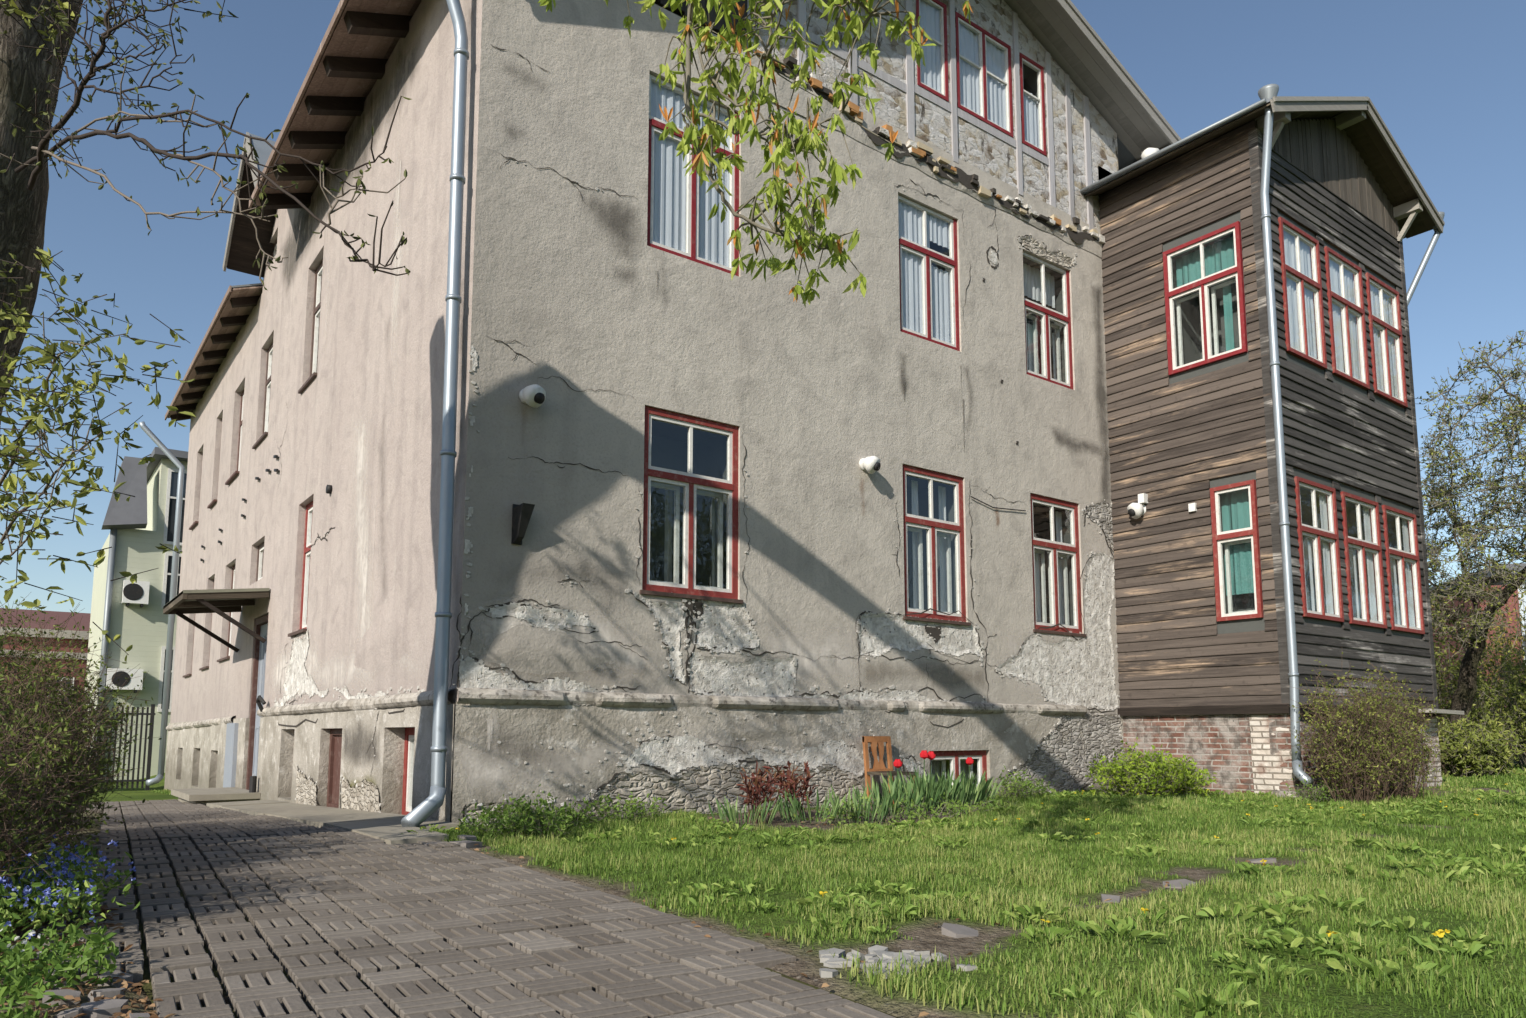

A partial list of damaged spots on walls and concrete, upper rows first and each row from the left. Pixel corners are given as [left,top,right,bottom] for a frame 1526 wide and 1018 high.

crack [486,148,636,200]
water stain [600,207,630,241]
flaking render [747,49,1106,267]
crack [487,336,634,398]
spalling [463,497,599,634]
crack [508,456,643,586]
crack [566,426,1079,699]
spalling [274,626,425,727]
crack [450,575,588,687]
spalling [453,588,987,829]
spalling [856,499,1125,793]